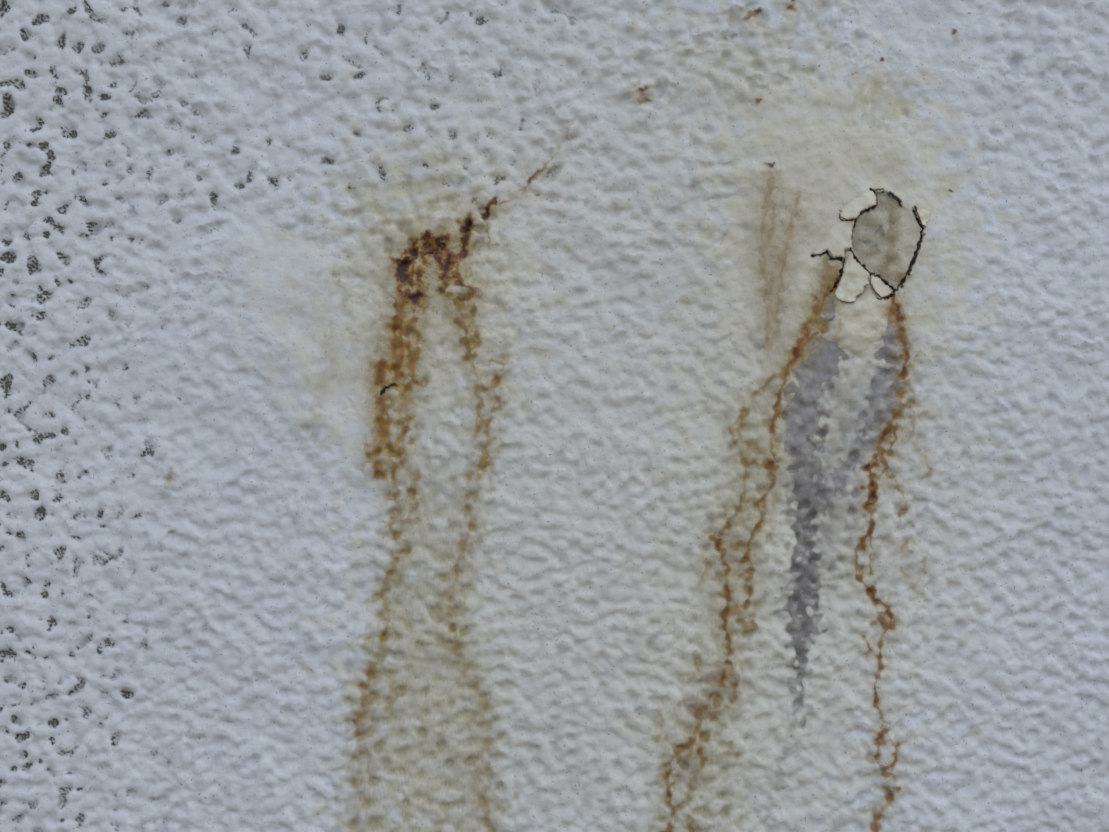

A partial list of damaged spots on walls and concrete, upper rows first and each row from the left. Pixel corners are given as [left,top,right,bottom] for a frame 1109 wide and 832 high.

corrosion [760,162,789,323]
peeling [811,188,931,354]
corrosion [365,197,498,612]
corrosion [467,359,504,478]
corrosion [663,275,841,832]
corrosion [855,295,913,832]
corrosion [354,663,403,752]